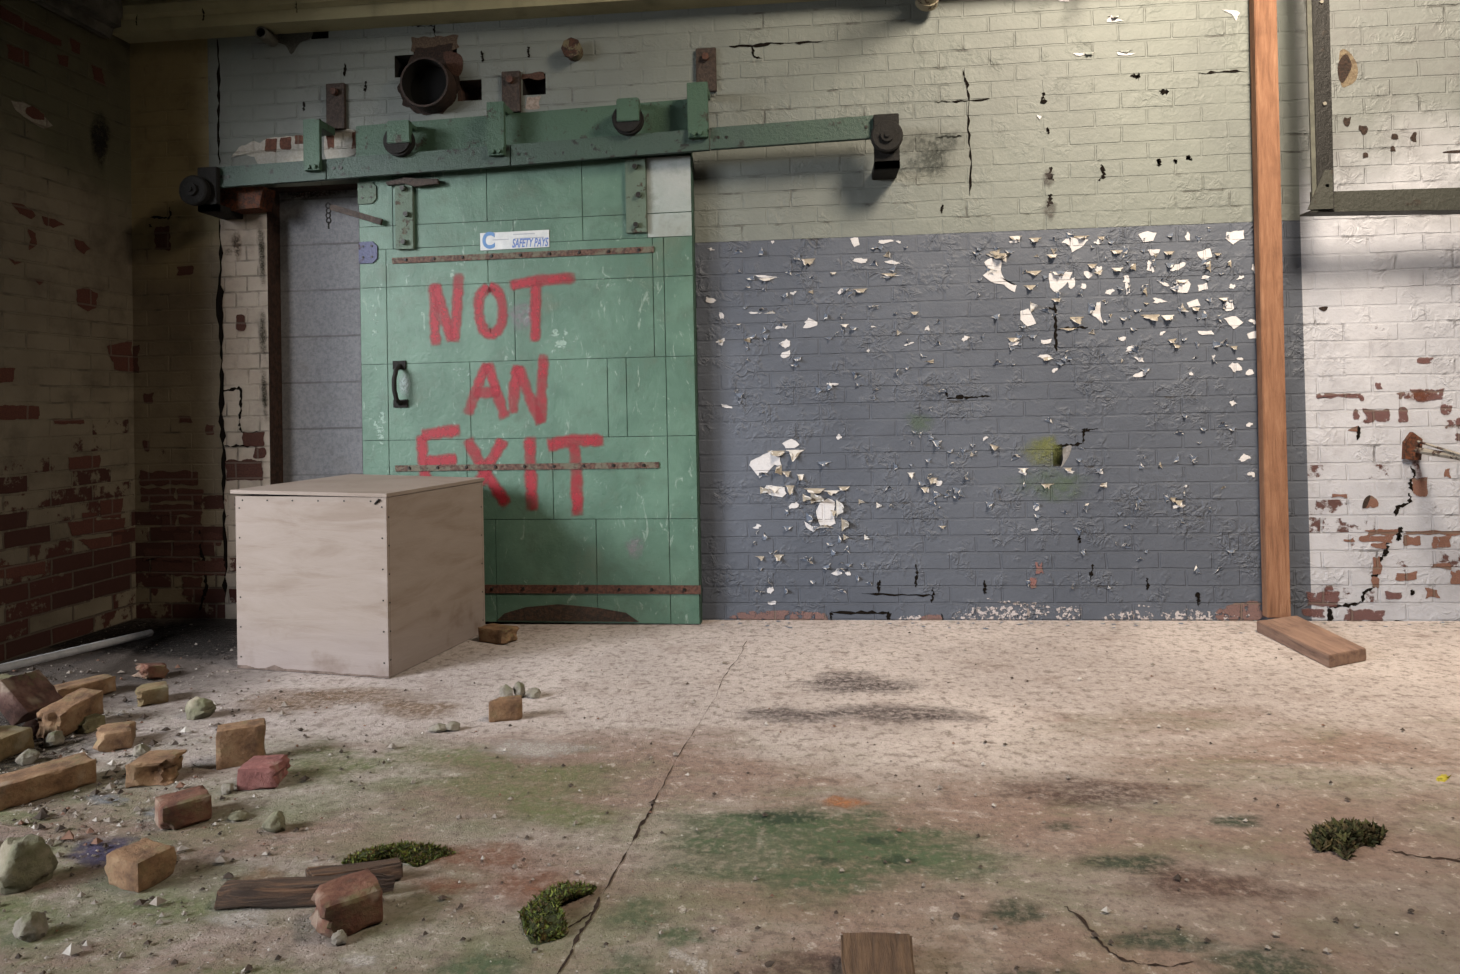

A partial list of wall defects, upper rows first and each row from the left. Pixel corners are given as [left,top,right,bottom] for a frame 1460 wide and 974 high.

peeling [324,129,356,159]
crack [935,70,990,213]
peeling [706,237,941,377]
peeling [972,227,1256,377]
flaking render [225,431,267,481]
peeling [729,431,1107,621]
spalling [1331,494,1379,508]
crack [1327,467,1416,621]
flaking render [1302,529,1460,621]
flaking render [1316,382,1460,441]
flaking render [1412,469,1451,497]
crack [557,641,747,974]